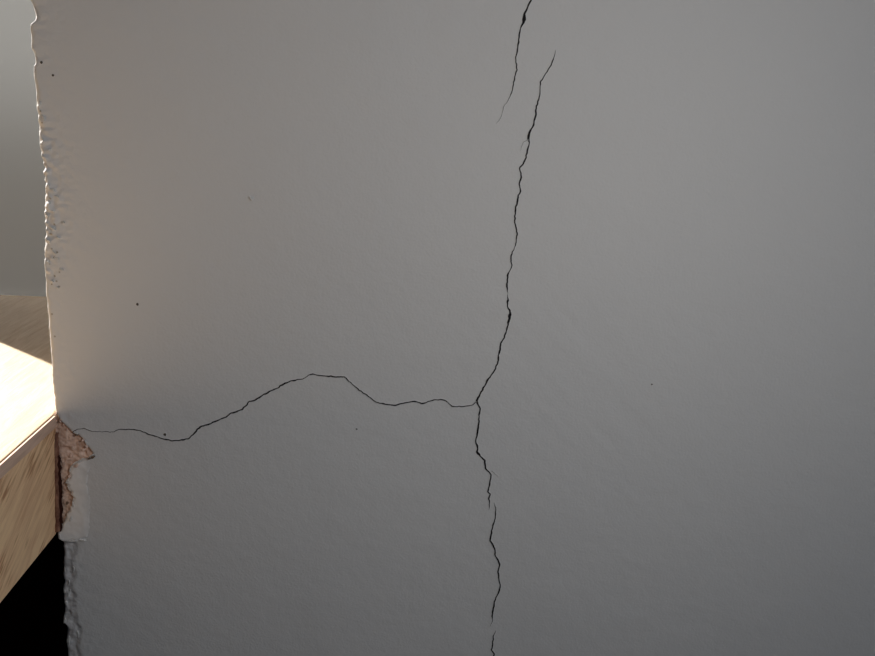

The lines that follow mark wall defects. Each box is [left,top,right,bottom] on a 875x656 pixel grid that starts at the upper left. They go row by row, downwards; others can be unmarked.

crack [496,0,533,124]
crack [72,50,556,656]
spalling [55,413,95,523]
spalling [58,533,83,656]